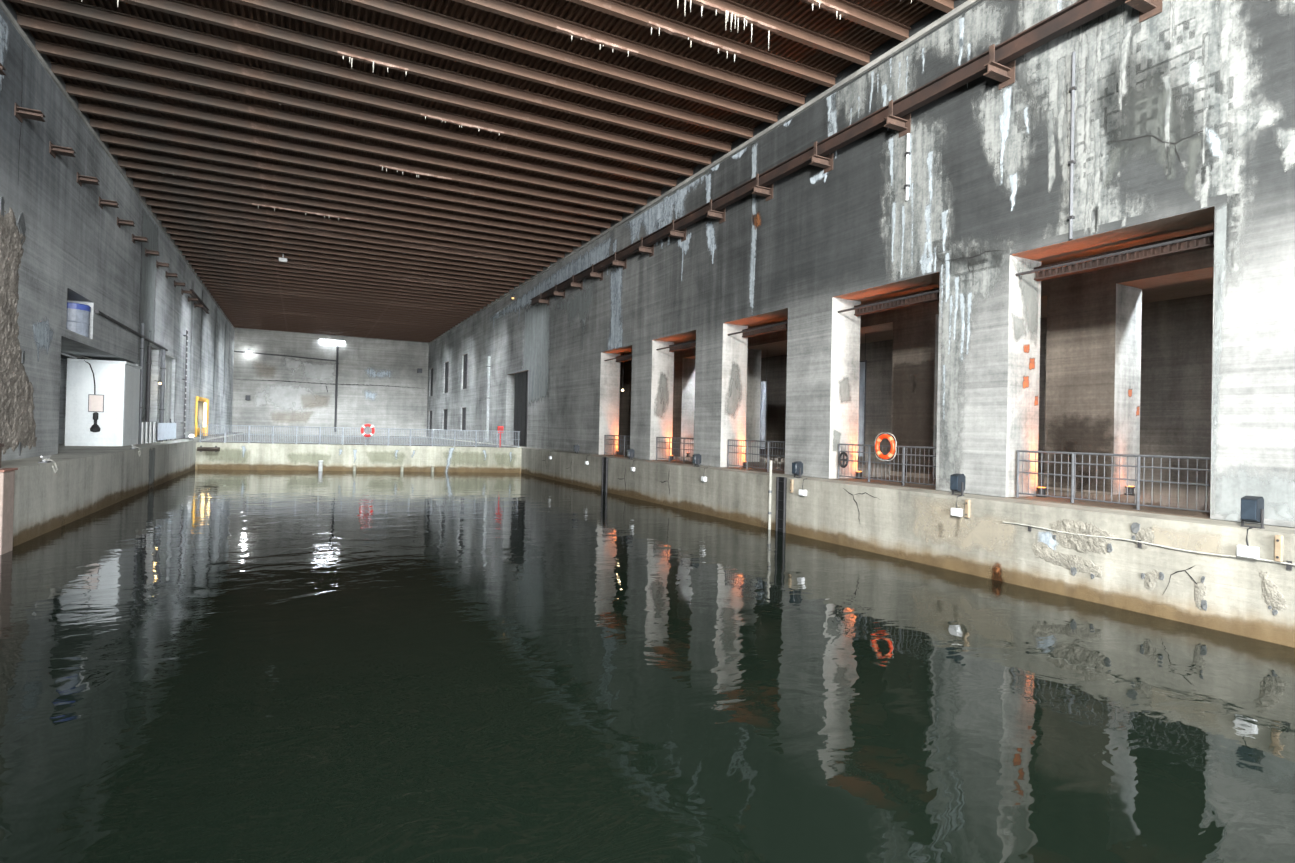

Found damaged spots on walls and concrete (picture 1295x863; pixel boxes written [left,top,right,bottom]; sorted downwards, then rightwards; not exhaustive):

leakage [647,0,781,63]
leakage [804,0,1077,184]
spalling [0,196,37,456]
leakage [881,122,1012,484]
leakage [978,0,1295,522]
crack [1163,565,1197,594]